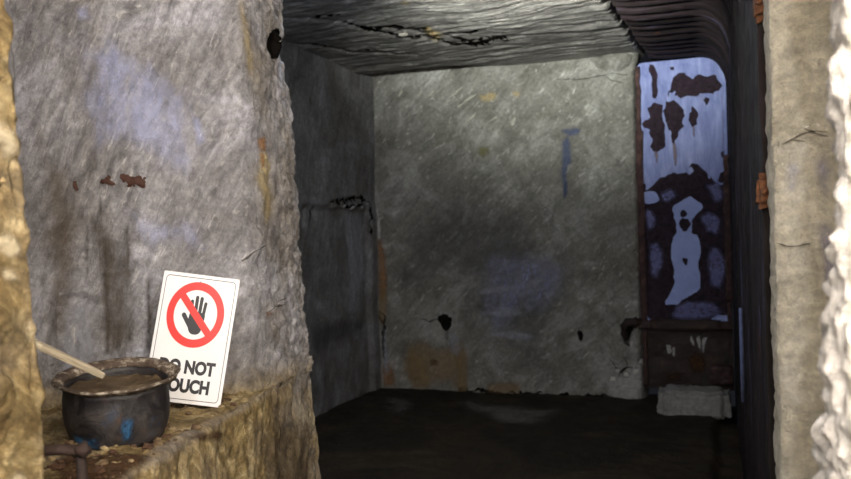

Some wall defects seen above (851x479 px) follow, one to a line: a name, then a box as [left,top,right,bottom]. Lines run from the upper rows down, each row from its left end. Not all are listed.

crack [295,14,508,53]